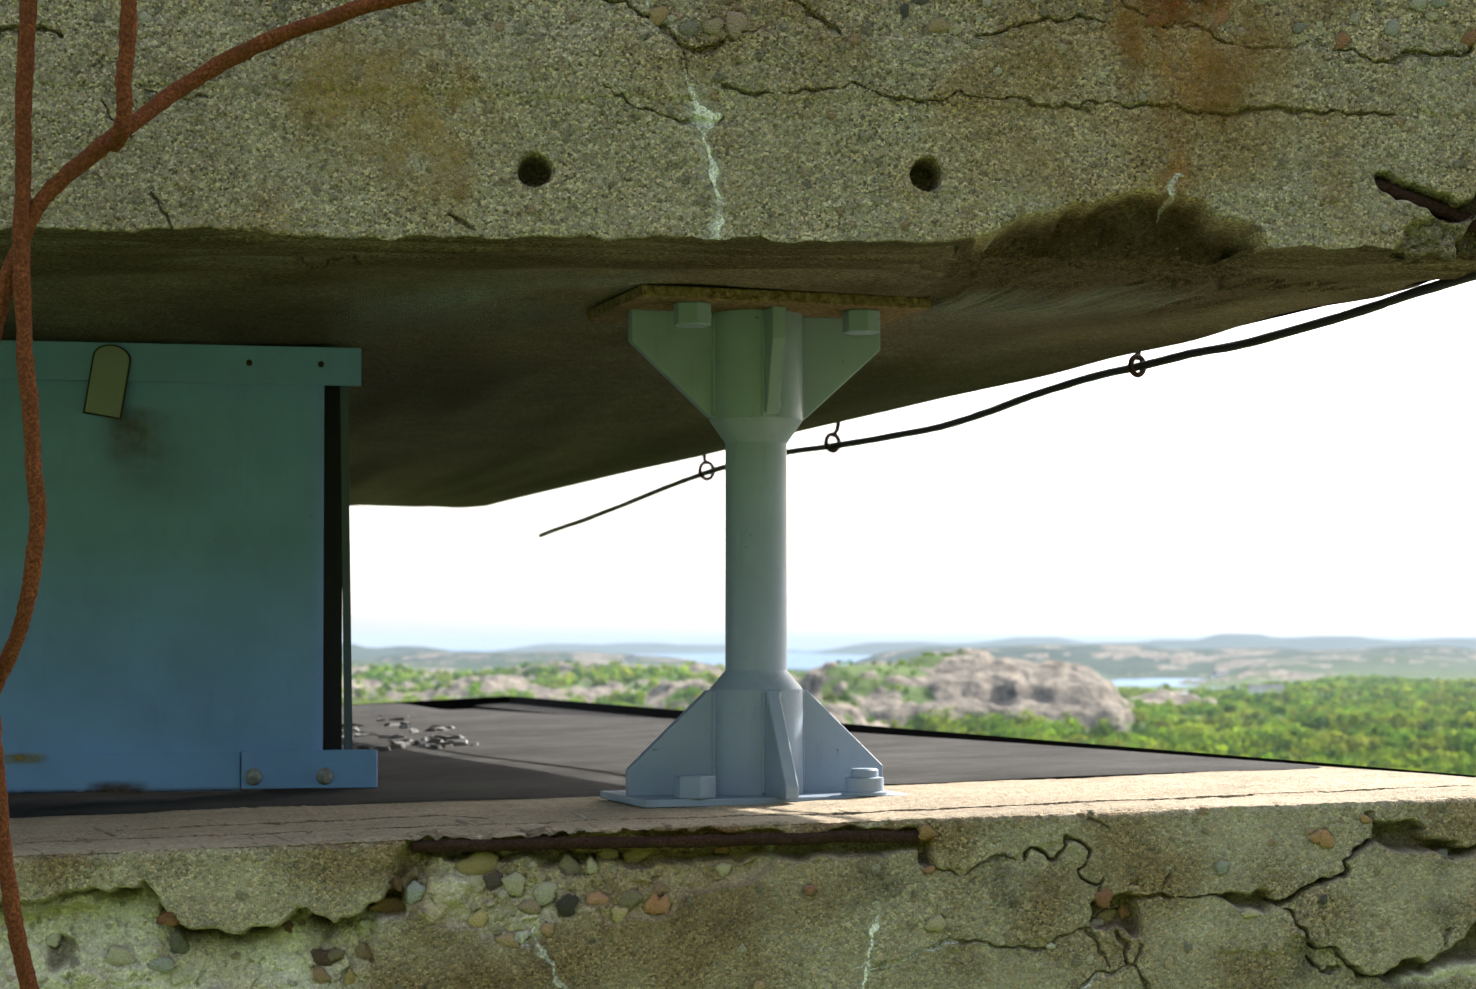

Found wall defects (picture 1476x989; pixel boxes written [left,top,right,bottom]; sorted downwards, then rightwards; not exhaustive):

crack [601,0,1396,134]
crack [972,0,1476,66]
damp [686,74,725,240]
spalling [909,191,1264,317]
spalling [1374,173,1476,266]
spalling [0,0,422,694]
spalling [0,717,388,989]
spalling [411,830,920,853]
crack [11,785,1470,989]
spalling [1367,819,1476,859]